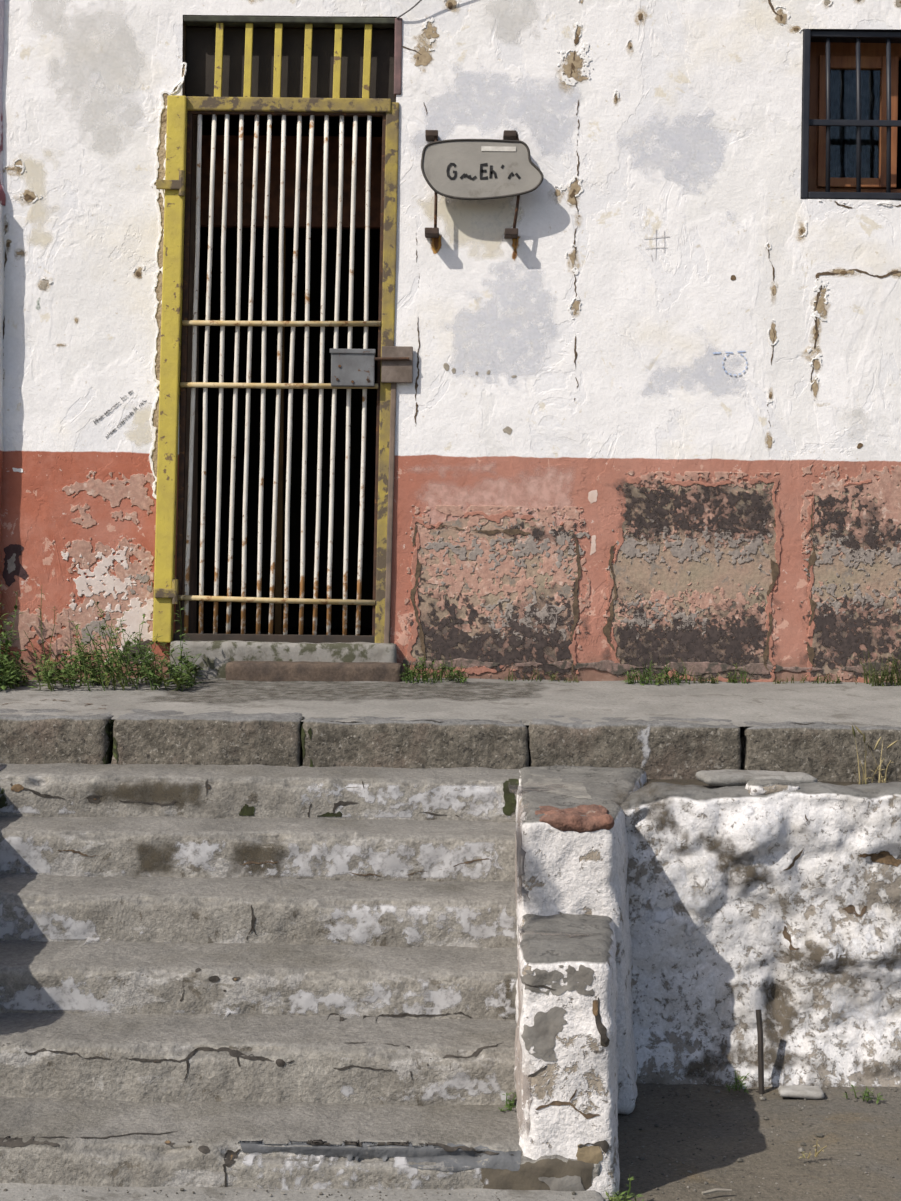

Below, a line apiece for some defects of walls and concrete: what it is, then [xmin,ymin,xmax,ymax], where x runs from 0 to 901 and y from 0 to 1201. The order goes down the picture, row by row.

crack [768,0,804,33]
peeling [1,62,187,666]
crack [765,242,778,448]
crack [805,268,901,400]
peeling [405,471,783,682]
peeling [800,464,901,683]
crack [3,1043,294,1078]
peeling [485,964,594,1061]
crack [0,1130,241,1187]